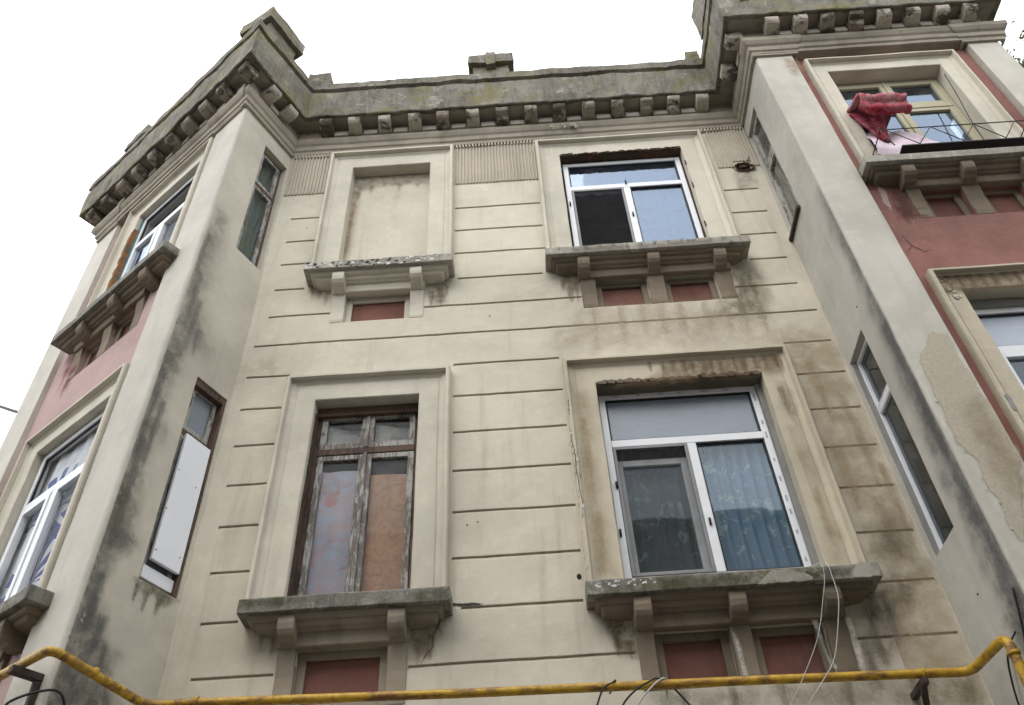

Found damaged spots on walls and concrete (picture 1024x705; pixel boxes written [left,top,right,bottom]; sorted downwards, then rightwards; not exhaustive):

damp [47,234,213,705]
crack [568,399,583,518]
damp [841,232,1024,626]
peeling [920,332,1024,540]
crack [422,621,442,661]